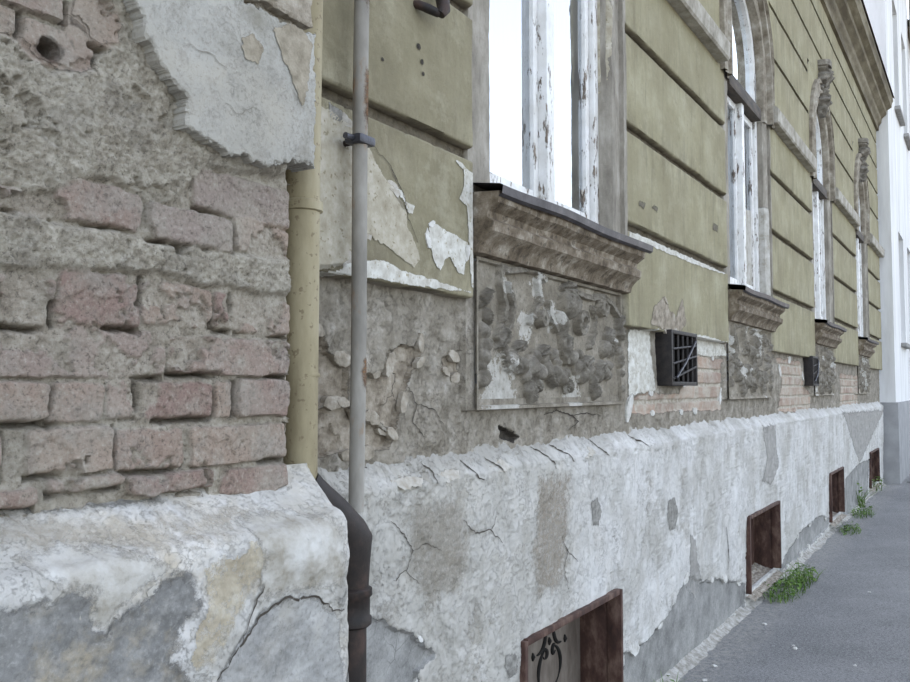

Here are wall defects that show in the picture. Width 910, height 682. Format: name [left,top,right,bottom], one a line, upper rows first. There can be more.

peeling [597,0,614,94]
peeling [0,0,352,277]
peeling [367,148,474,293]
spalling [318,323,351,461]
spalling [365,333,426,461]
spalling [441,350,460,383]
crack [392,522,442,584]
crack [217,587,344,680]
peeling [366,608,435,682]
peeling [624,572,746,682]